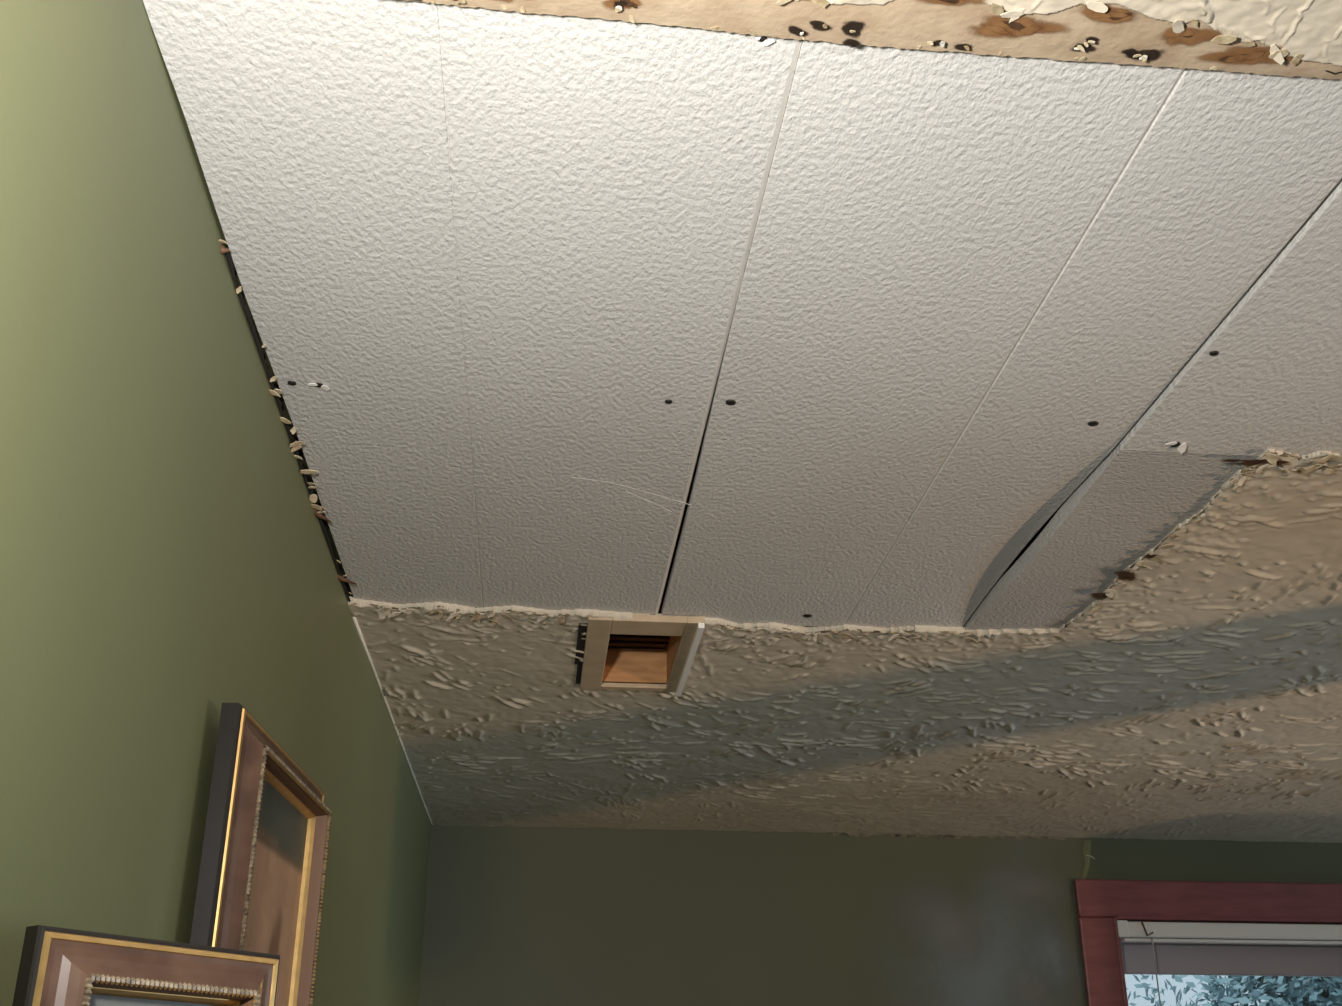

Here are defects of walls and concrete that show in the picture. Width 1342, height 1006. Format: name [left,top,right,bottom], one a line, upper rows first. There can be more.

peeling [403,0,1342,81]
spalling [1221,453,1342,490]
spalling [1087,516,1201,615]